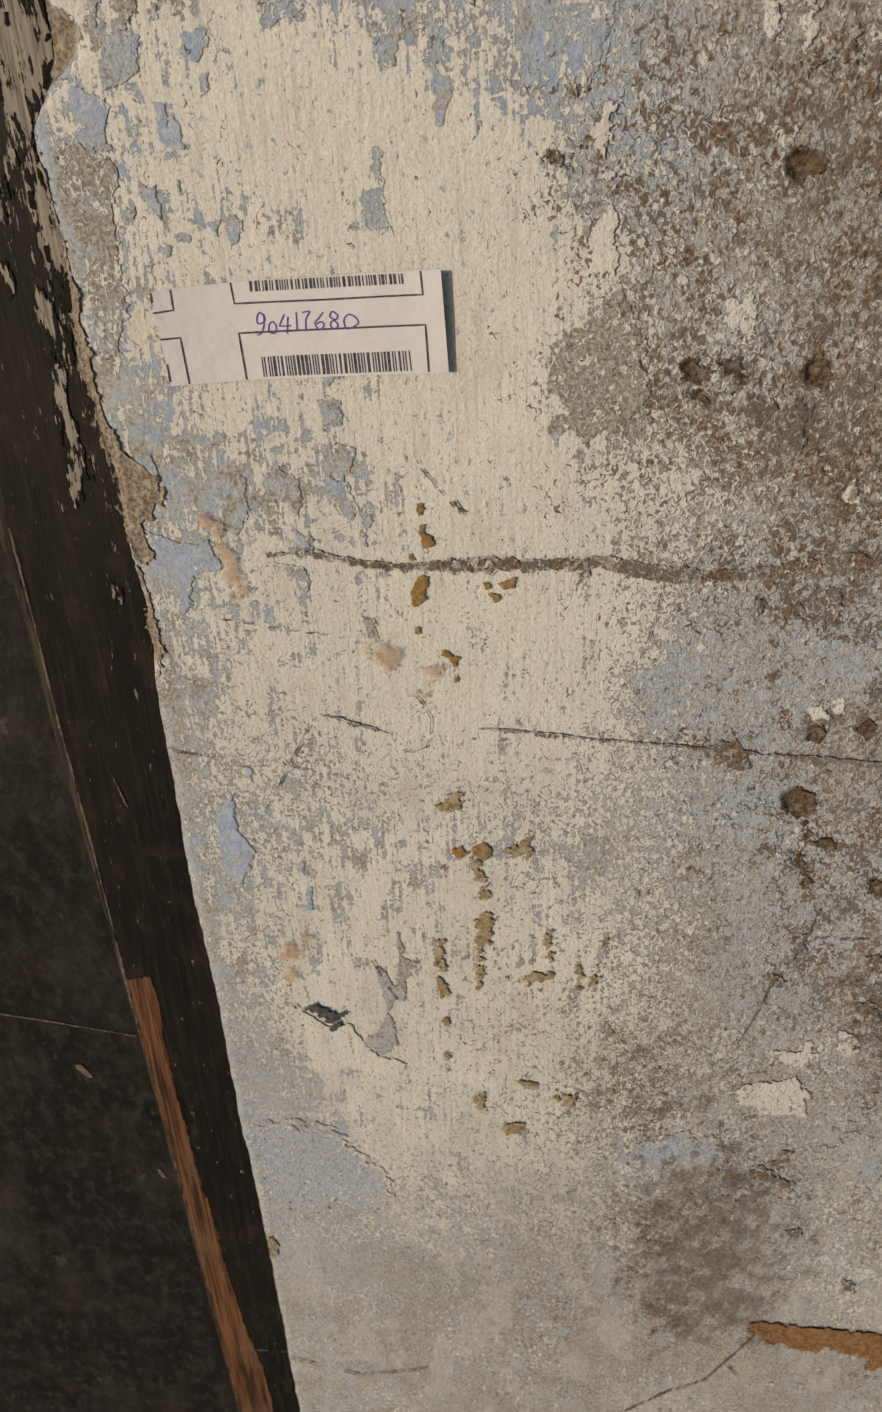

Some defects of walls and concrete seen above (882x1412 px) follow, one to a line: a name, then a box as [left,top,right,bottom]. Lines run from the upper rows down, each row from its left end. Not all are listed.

peeling [205,215,243,246]
peeling [343,146,393,235]
peeling [0,0,222,678]
peeling [312,376,374,548]
peeling [218,466,313,551]
peeling [272,562,311,592]
peeling [361,615,378,639]
peeling [409,503,434,607]
peeling [441,649,460,683]
crack [265,548,882,660]
peeling [601,586,882,1025]
peeling [836,1001,882,1061]